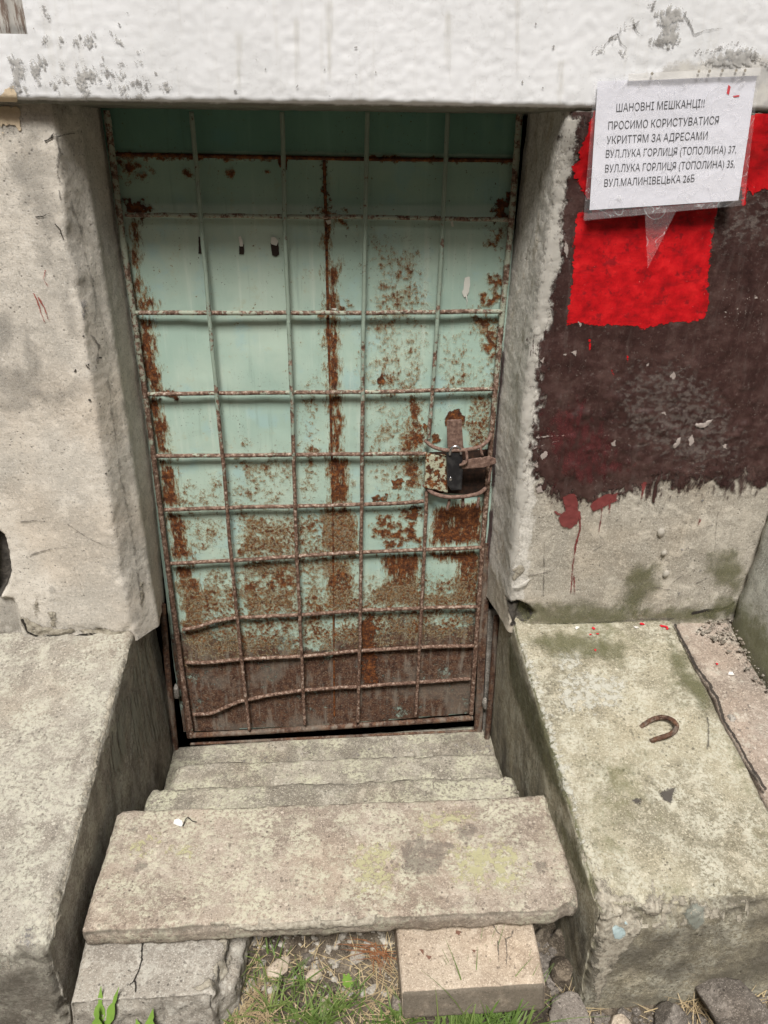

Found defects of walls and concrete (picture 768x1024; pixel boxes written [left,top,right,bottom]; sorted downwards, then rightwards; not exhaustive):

peeling [0,28,172,133]
peeling [648,0,692,49]
peeling [695,41,768,68]
corrosion [117,150,510,732]
spalling [0,531,12,596]
crack [128,943,144,992]